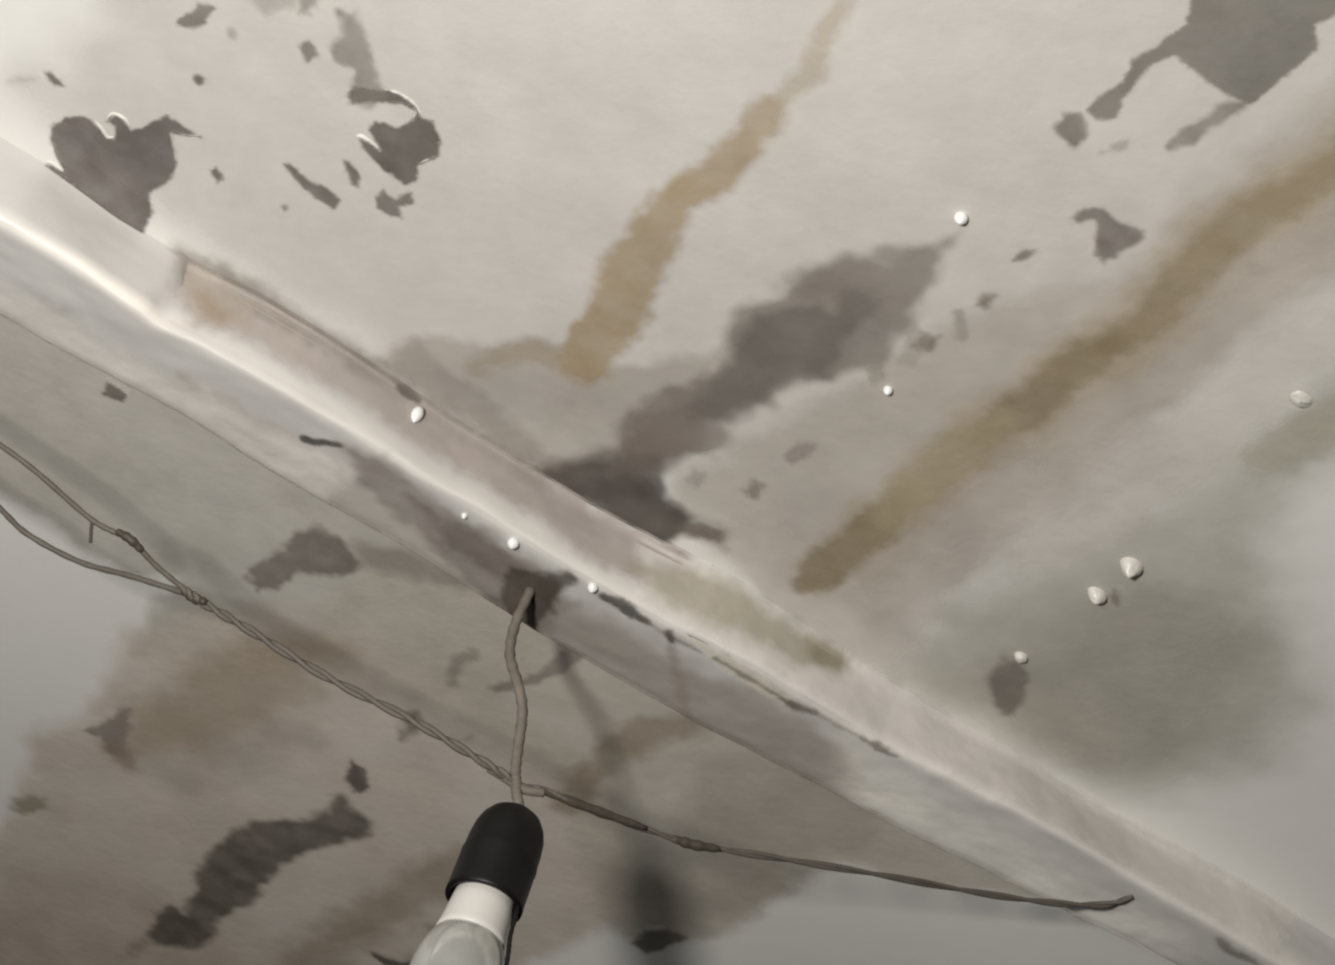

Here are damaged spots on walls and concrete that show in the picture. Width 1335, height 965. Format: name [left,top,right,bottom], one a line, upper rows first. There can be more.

water stain [81,50,162,135]
peeling [178,7,212,26]
water stain [802,0,909,45]
water stain [1152,0,1190,62]
peeling [1056,0,1335,145]
peeling [45,112,202,233]
peeling [285,165,338,207]
peeling [349,75,440,215]
peeling [1075,209,1140,258]
water stain [181,23,1288,949]
peeling [347,765,367,790]
peeling [150,797,367,947]